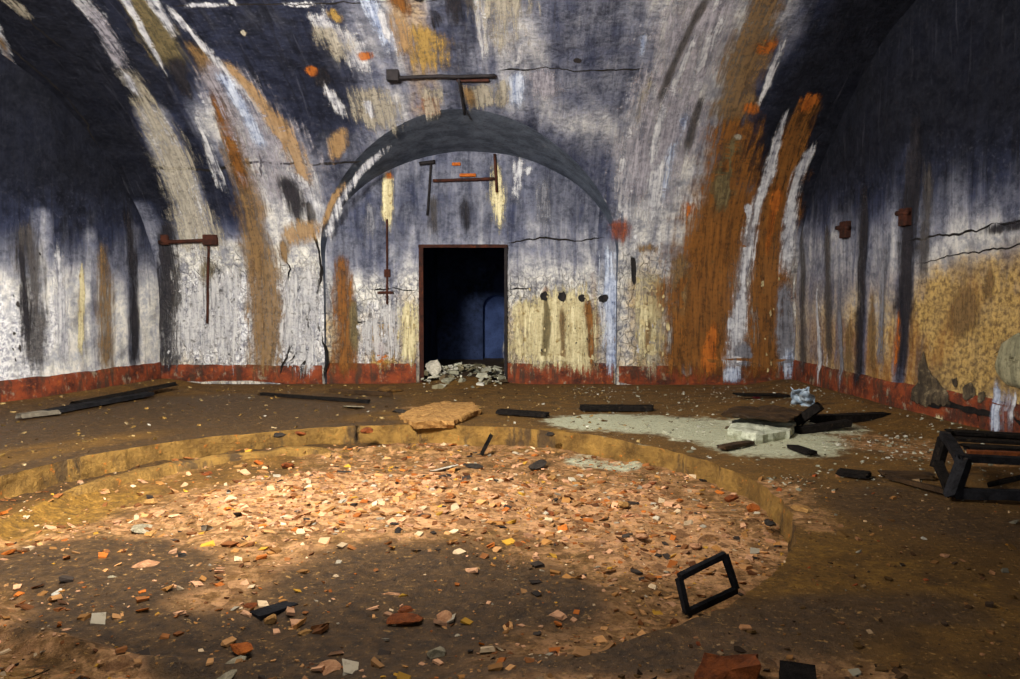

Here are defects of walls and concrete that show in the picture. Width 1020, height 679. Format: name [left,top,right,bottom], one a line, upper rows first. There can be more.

corrosion [390,12,448,73]
corrosion [422,88,443,117]
corrosion [188,45,286,376]
corrosion [330,258,358,375]
corrosion [651,0,819,380]
damp [776,119,933,390]
crack [914,220,1020,264]
damp [949,268,993,339]